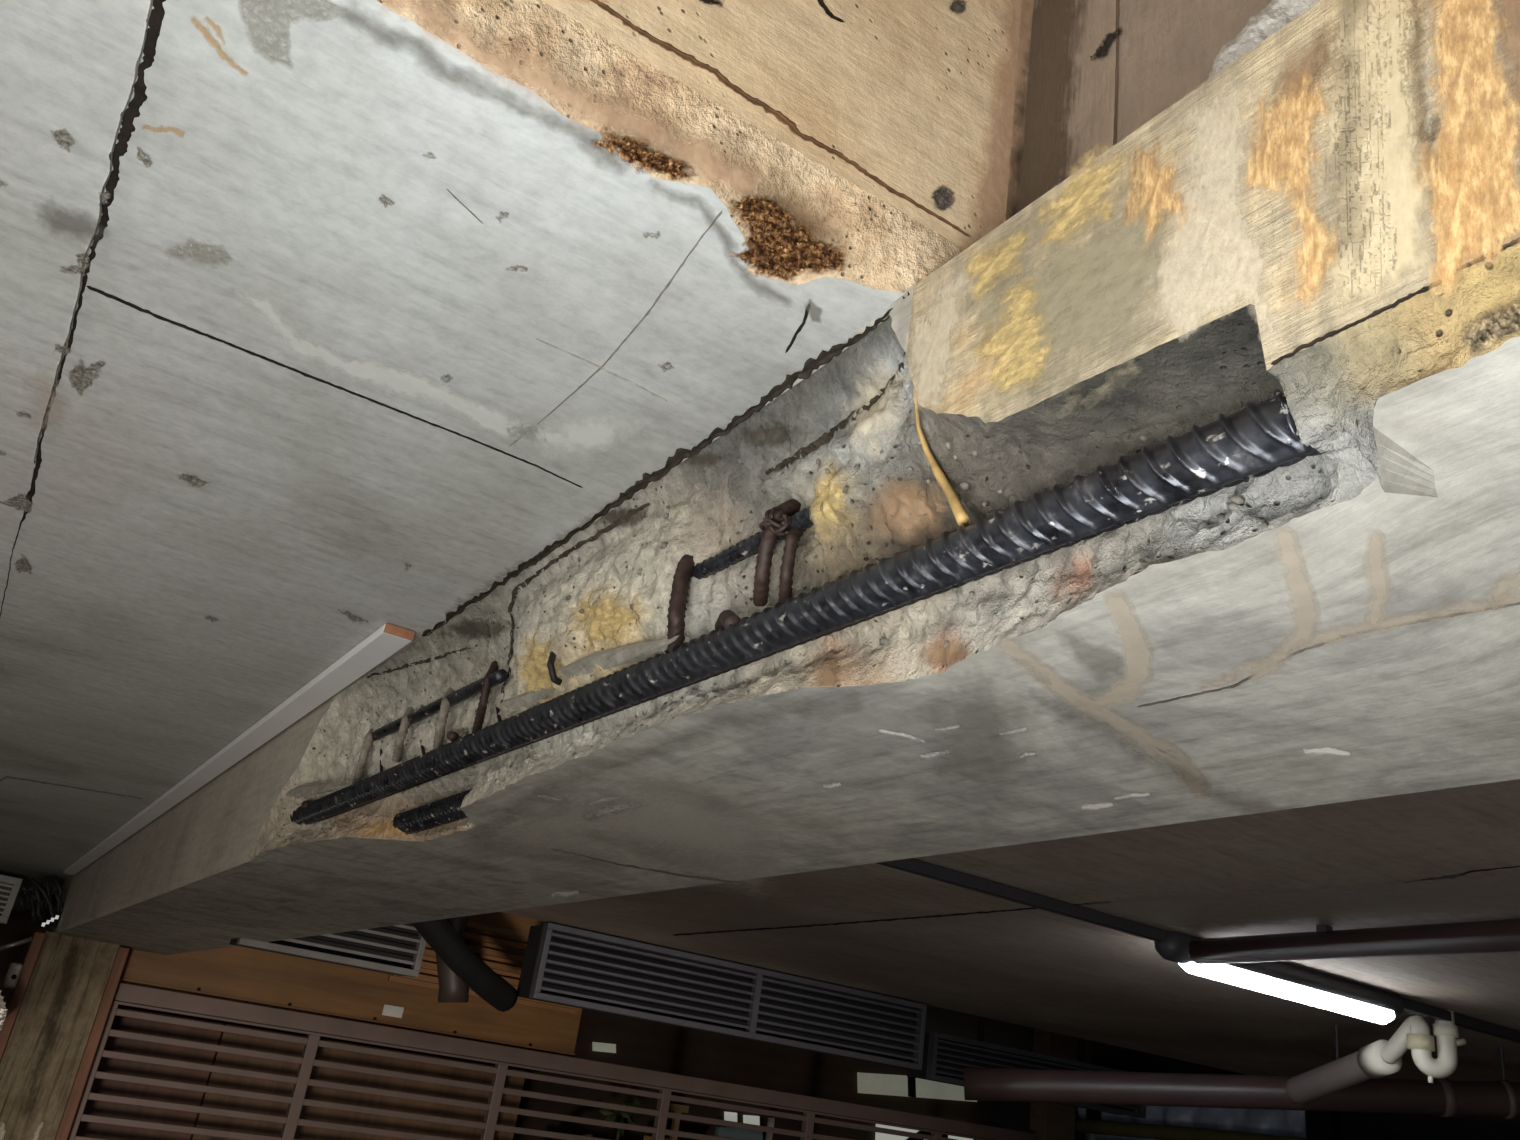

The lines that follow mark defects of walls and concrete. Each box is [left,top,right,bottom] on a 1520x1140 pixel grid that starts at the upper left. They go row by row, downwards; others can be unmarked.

crack [0,0,910,703]
crack [590,0,971,237]
water stain [1006,0,1080,221]
water stain [980,98,1266,383]
water stain [1318,0,1427,301]
spalling [248,243,1520,860]
crack [0,776,142,799]
crack [1403,866,1520,883]